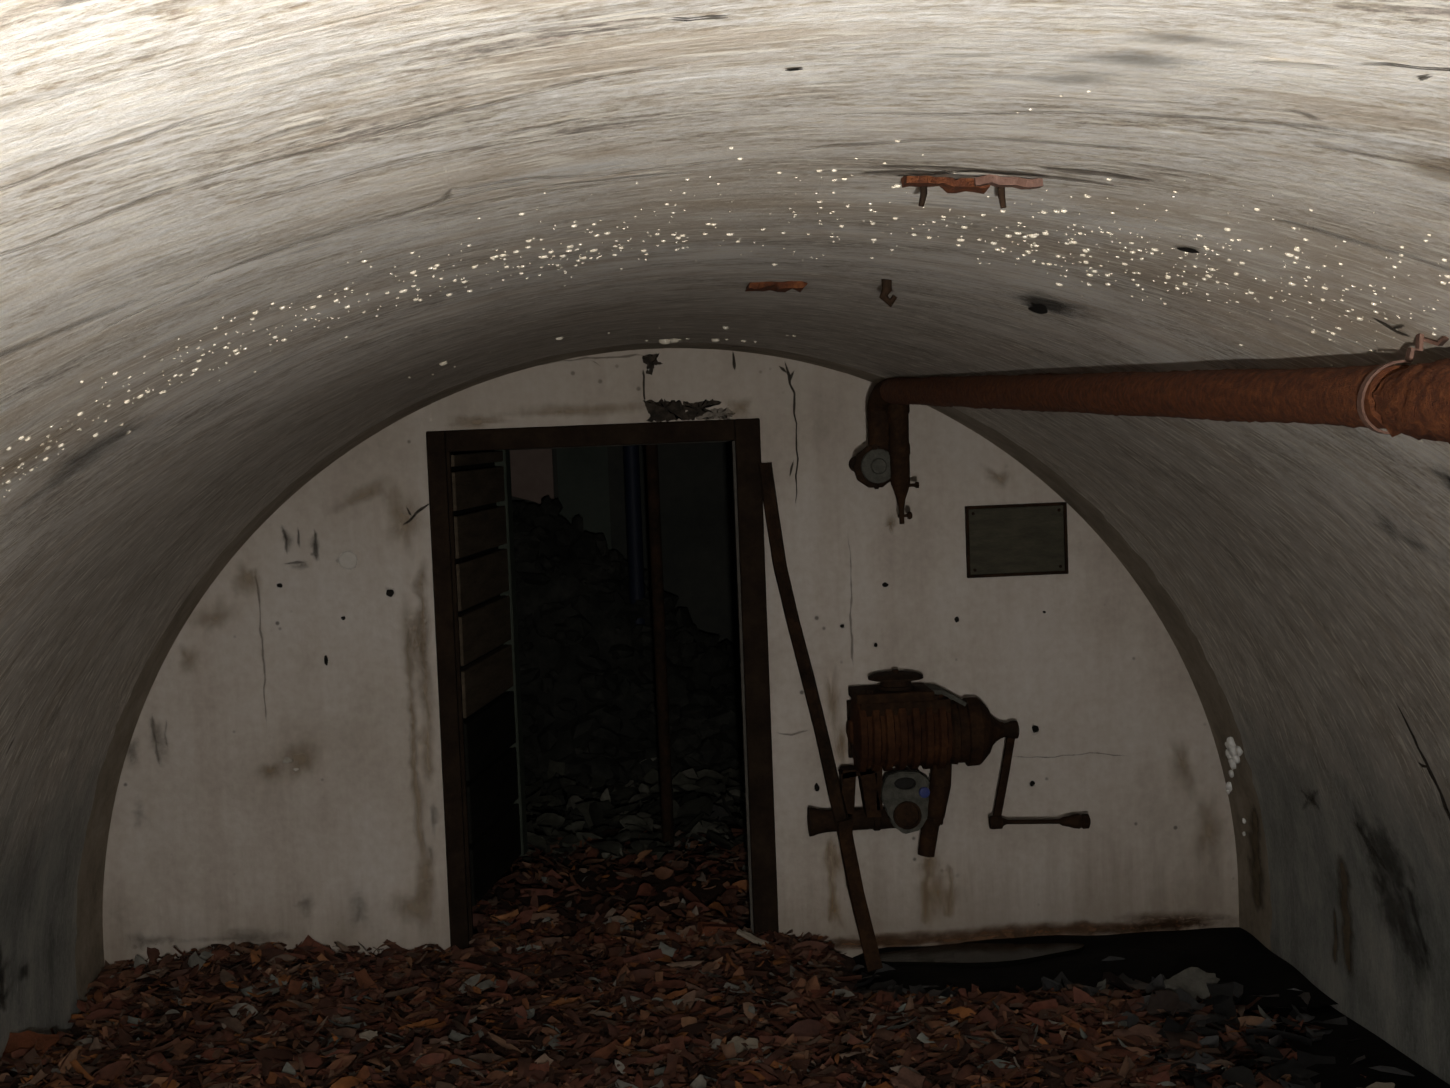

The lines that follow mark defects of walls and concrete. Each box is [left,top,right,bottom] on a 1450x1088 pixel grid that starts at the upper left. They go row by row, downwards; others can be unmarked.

crack [1372,64,1450,81]
water stain [407,574,430,841]
water stain [1225,737,1243,794]
crack [1397,705,1450,820]
water stain [1333,859,1352,974]